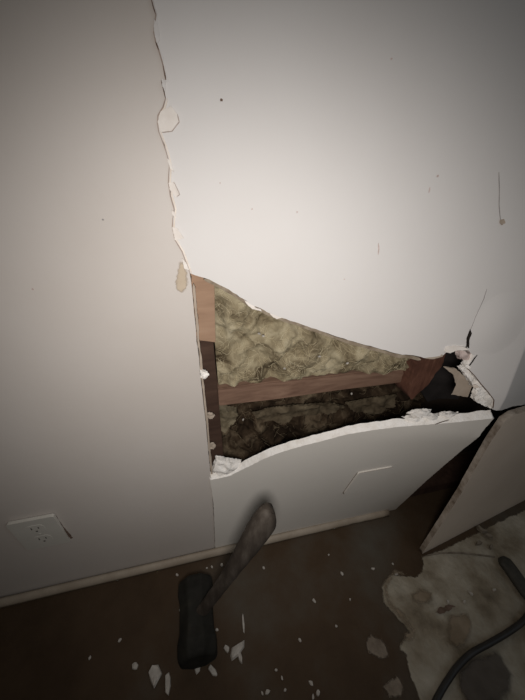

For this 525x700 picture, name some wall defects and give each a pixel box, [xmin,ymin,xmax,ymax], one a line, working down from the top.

crack [151,0,192,274]
spalling [426,329,495,408]
leakage [460,652,511,700]